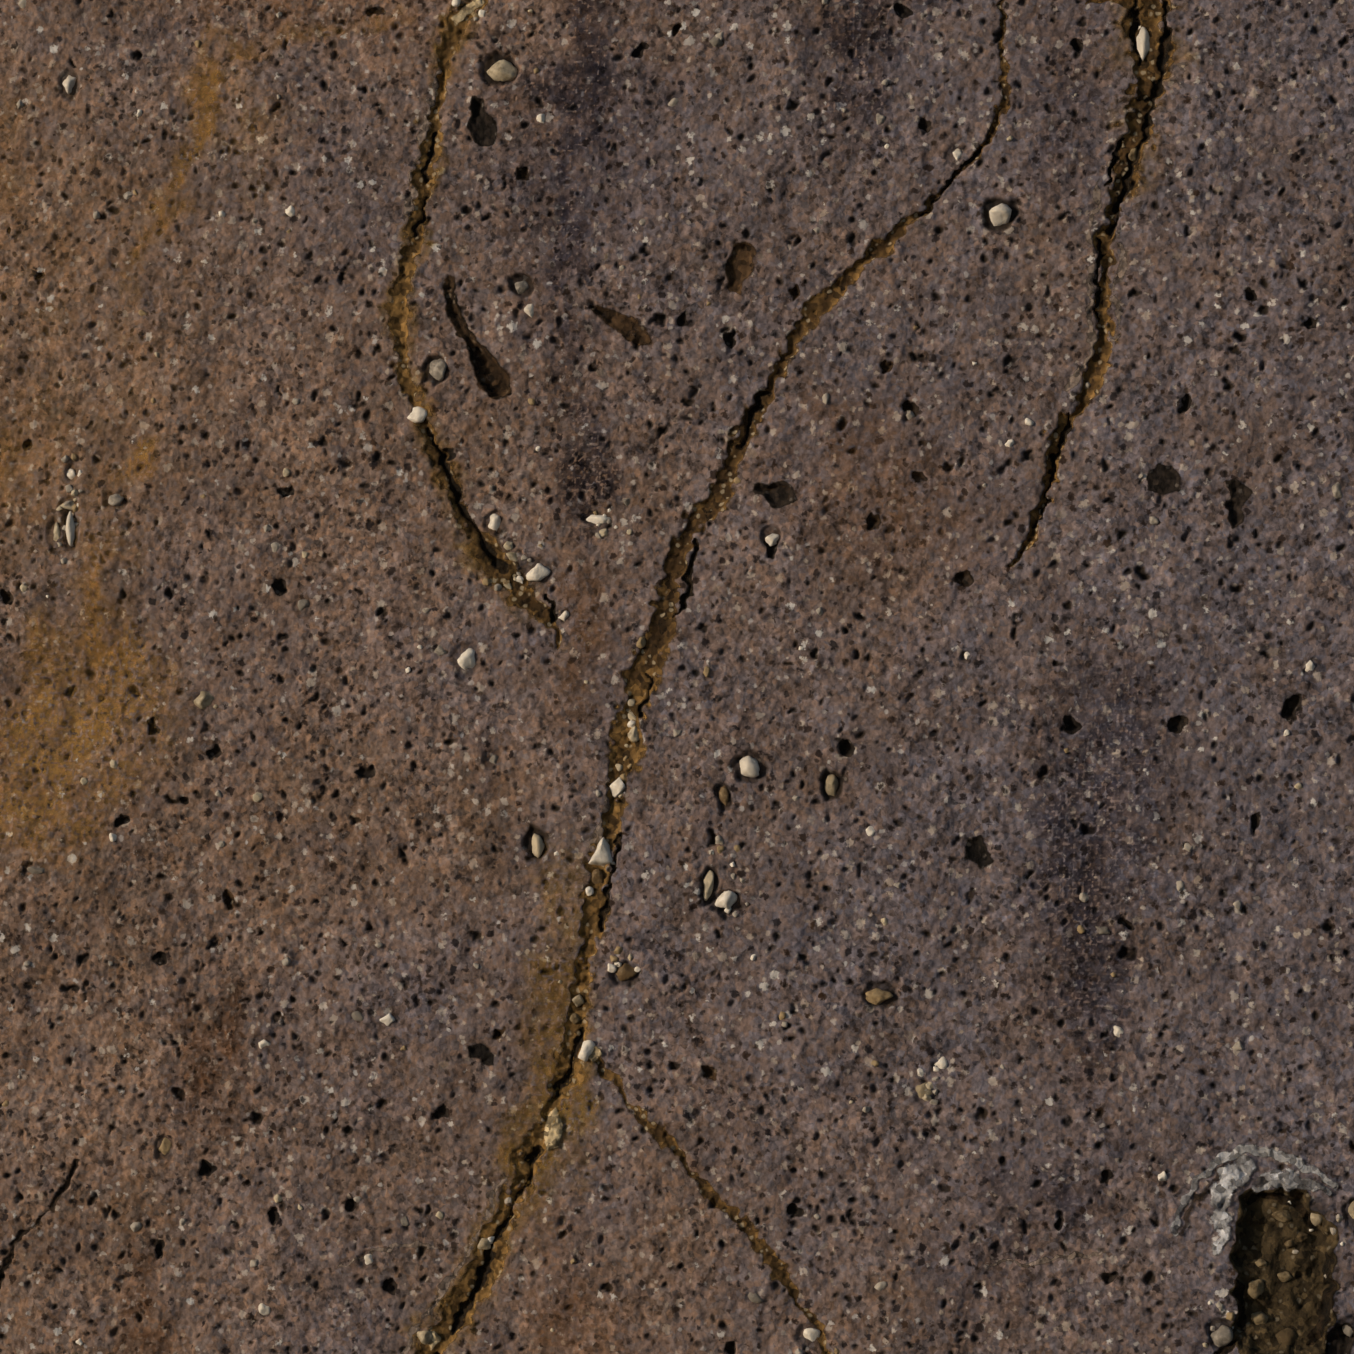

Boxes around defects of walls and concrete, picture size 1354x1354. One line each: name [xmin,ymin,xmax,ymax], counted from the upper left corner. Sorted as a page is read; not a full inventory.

crack [1008,0,1178,568]
crack [384,0,1012,1354]
crack [0,1159,80,1289]
crack [1214,1339,1236,1354]
spalling [1170,1144,1354,1354]